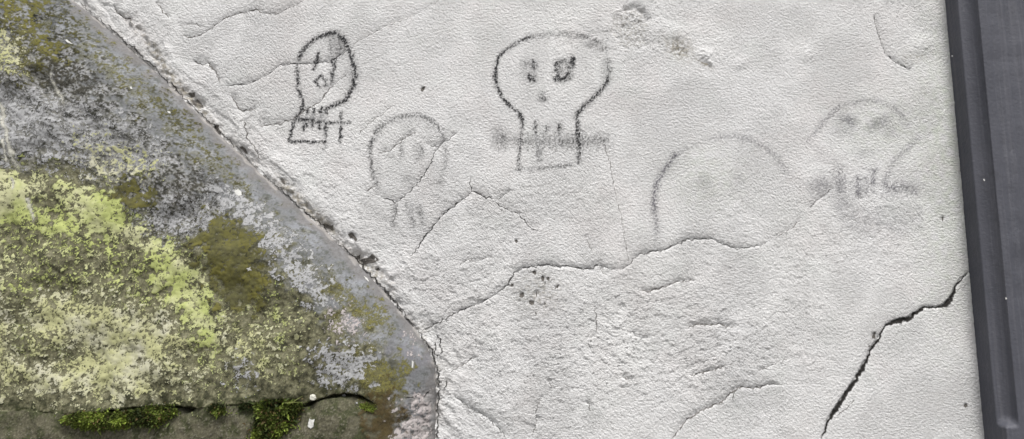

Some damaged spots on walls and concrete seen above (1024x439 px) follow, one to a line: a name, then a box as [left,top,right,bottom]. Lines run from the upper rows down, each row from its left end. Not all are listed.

crack [821,273,967,439]